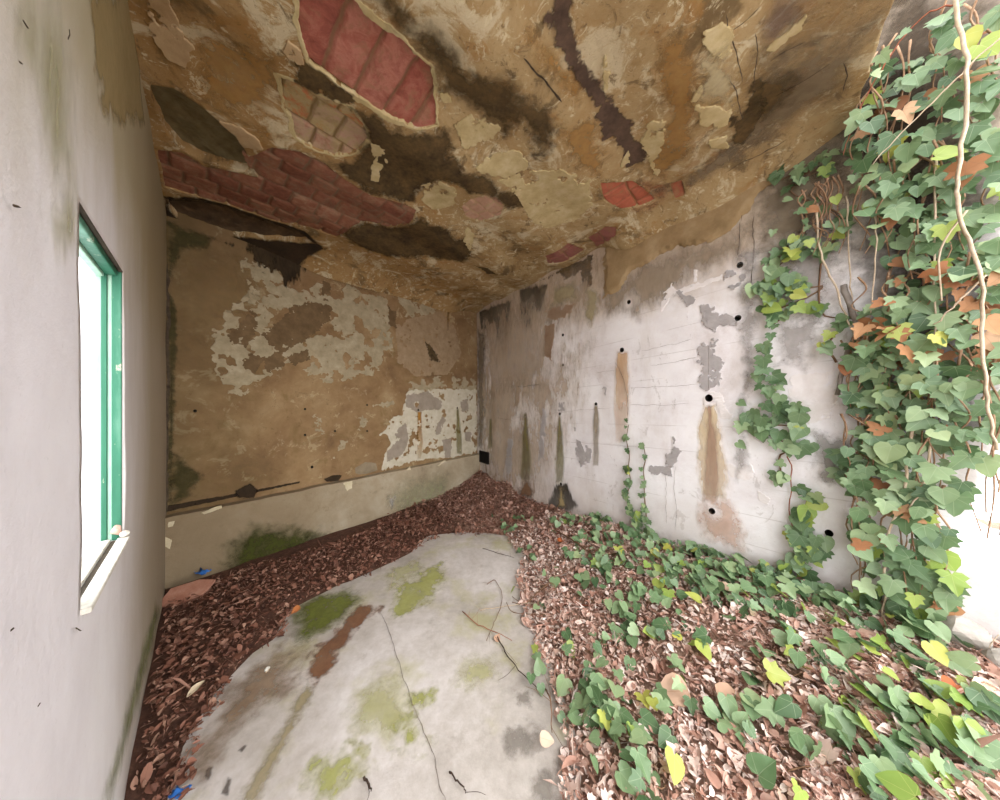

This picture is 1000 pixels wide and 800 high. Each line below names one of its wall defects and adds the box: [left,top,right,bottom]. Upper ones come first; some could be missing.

spalling [273,0,452,182]
damp [294,63,523,209]
damp [344,217,496,275]
damp [383,0,601,172]
crack [524,58,562,102]
flaking render [476,120,685,228]
damp [599,0,994,314]
peeling [210,257,478,471]
corrosion [616,353,628,400]
peeling [660,269,746,419]
corrosion [699,406,739,546]
crack [381,614,446,800]